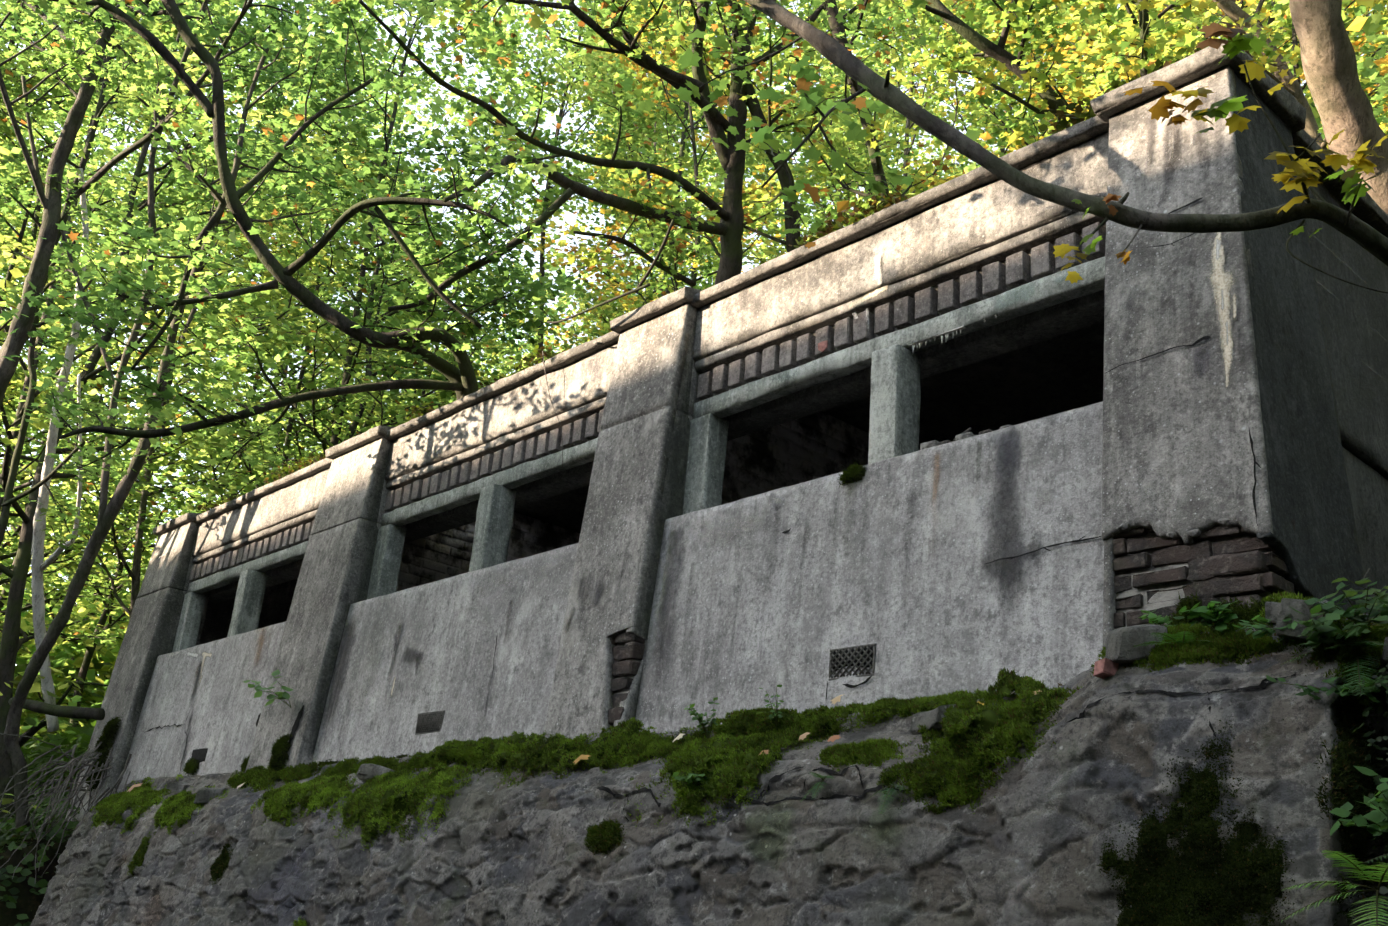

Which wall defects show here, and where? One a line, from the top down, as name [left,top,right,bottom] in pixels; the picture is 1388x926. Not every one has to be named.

damp [1198,232,1236,387]
damp [985,455,1035,598]
spalling [1112,518,1296,632]
crack [1249,429,1261,526]
spalling [608,630,645,726]